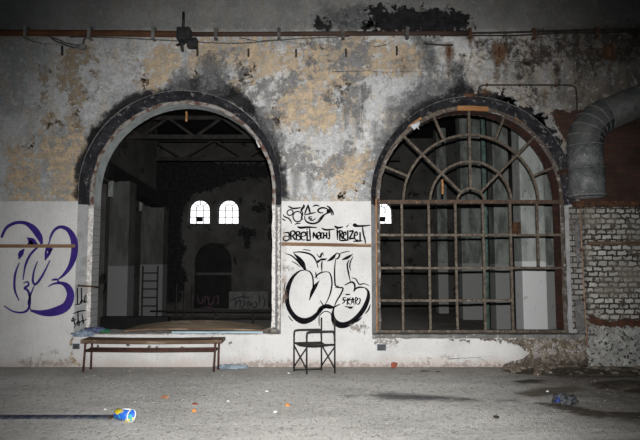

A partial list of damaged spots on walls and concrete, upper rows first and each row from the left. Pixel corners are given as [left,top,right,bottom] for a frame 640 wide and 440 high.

damp [475,25,640,88]
damp [87,128,99,146]
peeling [3,31,442,201]
flaking render [480,297,640,367]